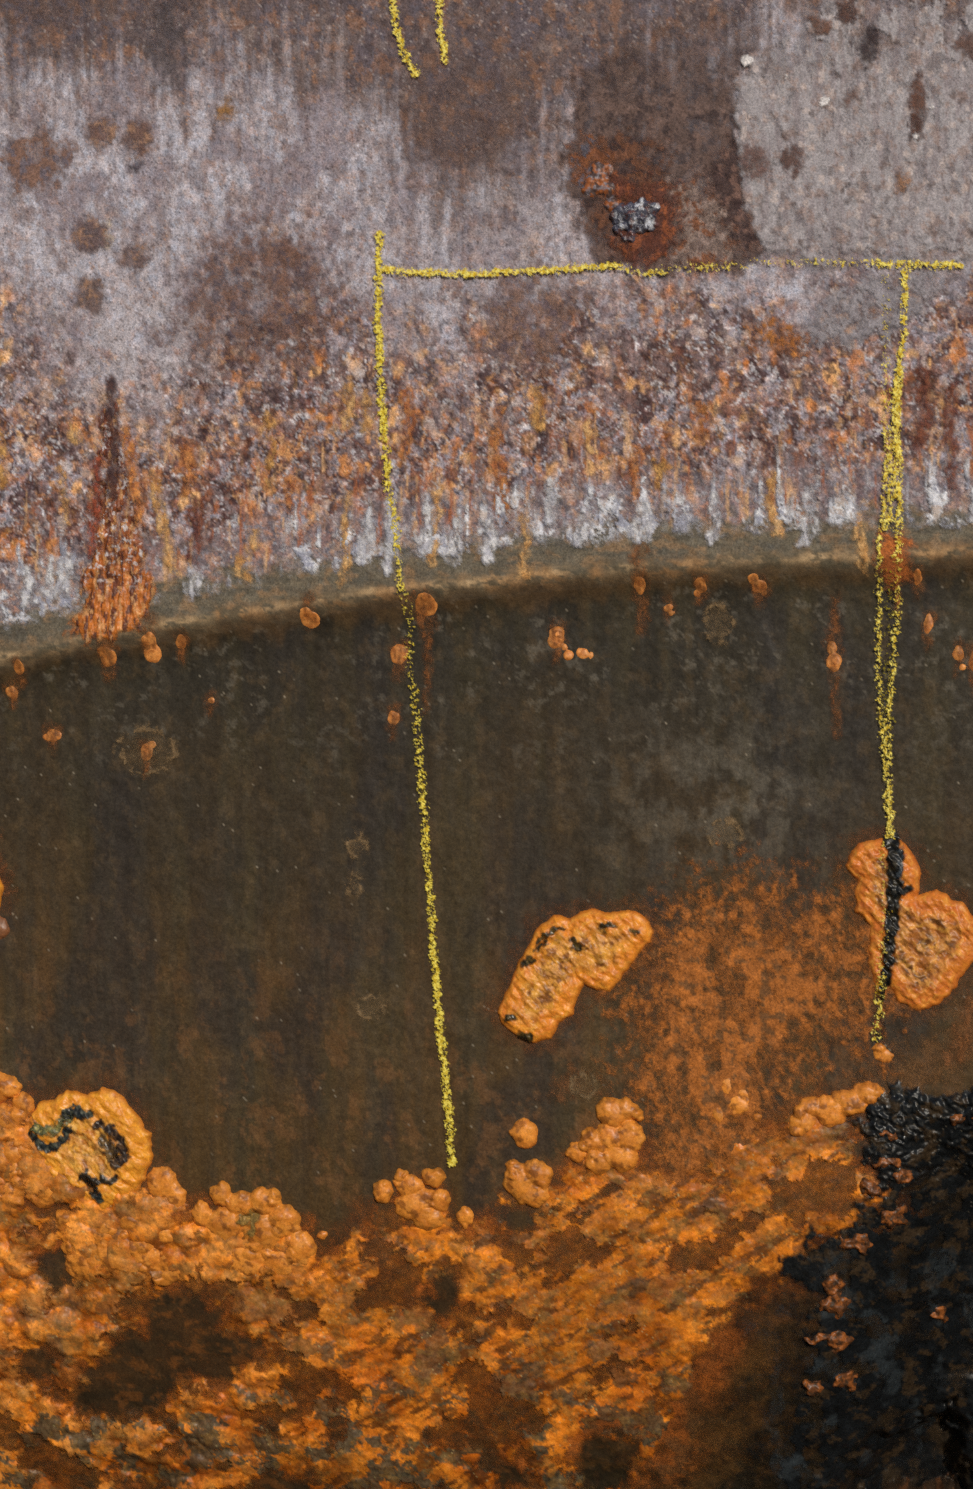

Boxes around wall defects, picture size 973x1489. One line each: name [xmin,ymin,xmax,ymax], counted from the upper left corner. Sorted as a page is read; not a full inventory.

rust [581,161,689,267]
rust [174,214,334,364]
rust [913,365,960,489]
leakage [0,538,79,624]
rust [71,375,213,644]
leakage [184,567,202,600]
leakage [286,476,721,632]
leakage [742,455,868,547]
rust [854,503,913,585]
leakage [906,466,973,527]
rust [0,853,914,1489]
rust [930,1306,949,1323]